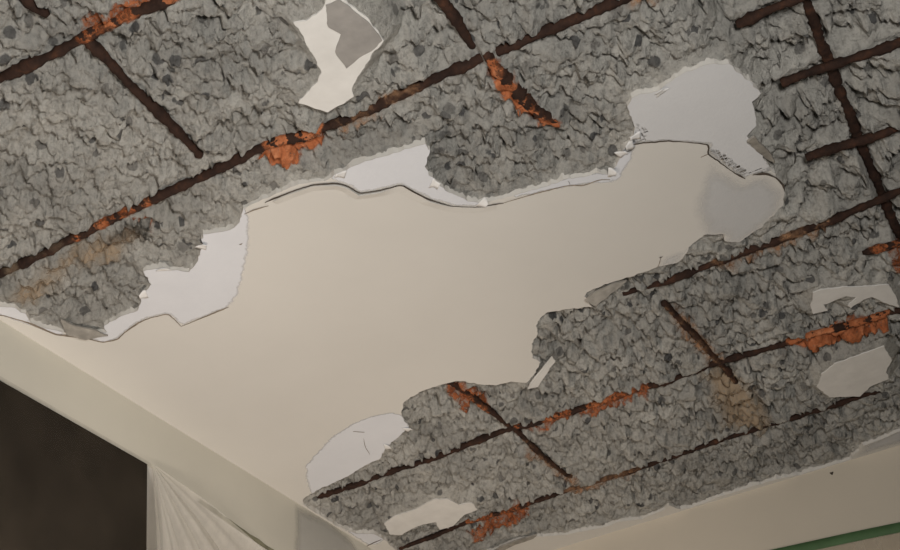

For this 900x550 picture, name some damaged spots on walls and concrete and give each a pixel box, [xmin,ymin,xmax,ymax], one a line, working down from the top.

spalling [0,0,130,83]
rust [76,0,148,43]
peeling [326,0,382,69]
spalling [735,0,805,28]
rust [487,59,560,128]
spalling [780,0,900,196]
rust [259,123,324,170]
spalling [100,142,271,225]
rust [786,309,890,353]
rust [514,383,649,431]
spalling [317,420,547,499]
rust [465,500,529,543]